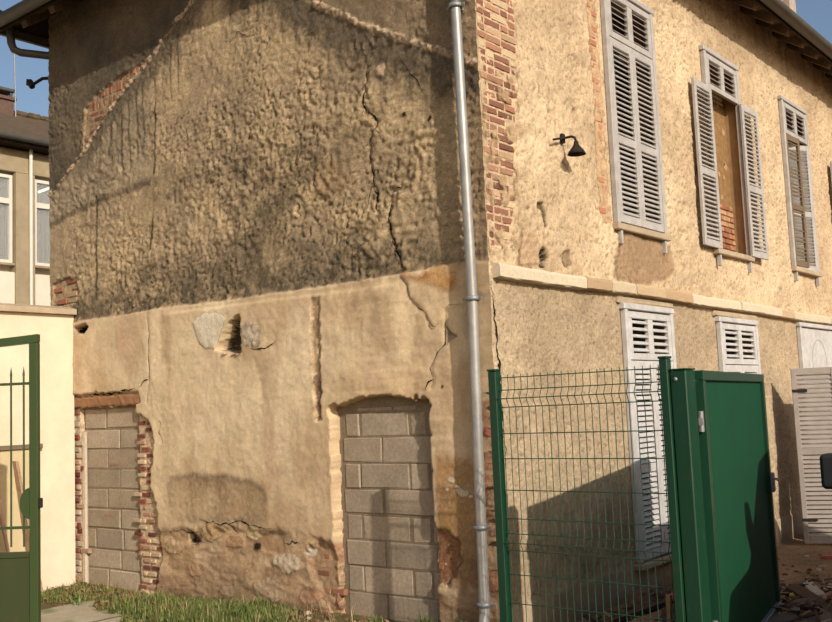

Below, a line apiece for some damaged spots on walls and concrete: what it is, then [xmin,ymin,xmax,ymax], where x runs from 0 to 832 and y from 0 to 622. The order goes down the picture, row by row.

flaking render [82,55,150,148]
flaking render [52,277,80,307]
spalling [192,312,275,356]
leakage [72,195,413,322]
crack [344,65,456,391]
crack [491,281,507,461]
flaking render [133,412,348,613]
spalling [437,529,461,585]
flaking render [440,605,467,622]